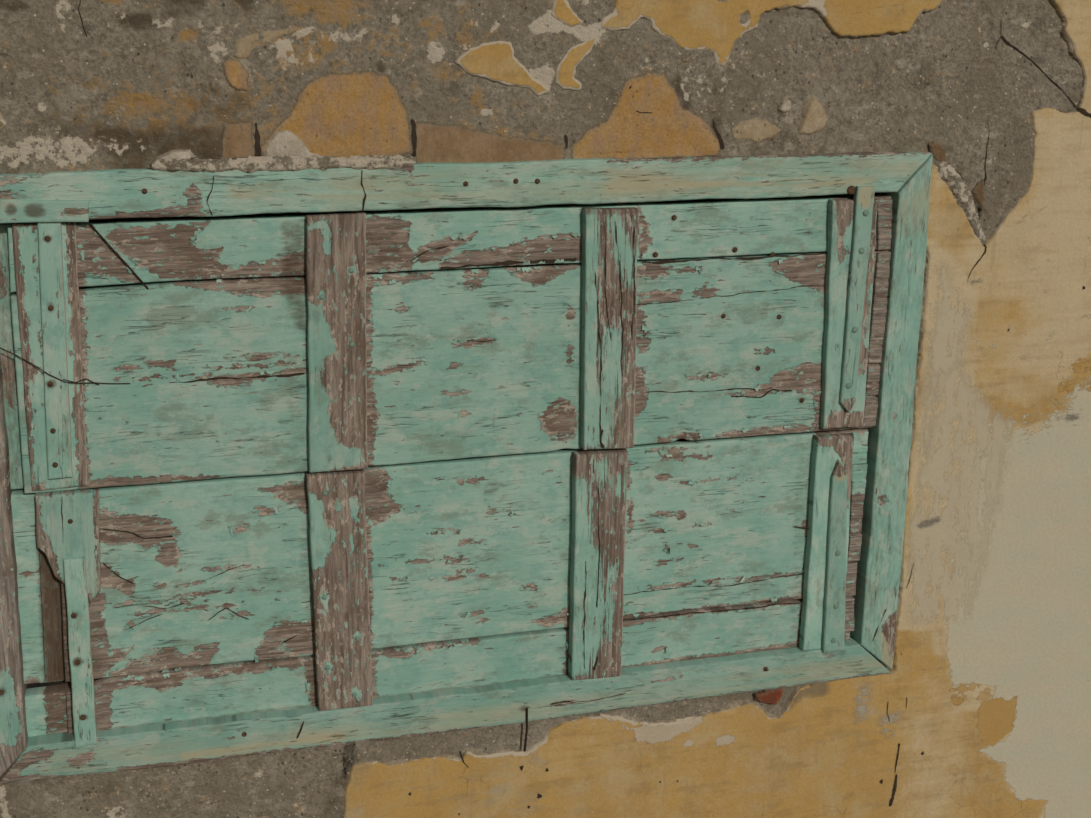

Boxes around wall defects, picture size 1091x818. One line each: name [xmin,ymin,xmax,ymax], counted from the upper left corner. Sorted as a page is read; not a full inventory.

flaking render [0,0,1083,245]
crack [994,20,1091,117]
peeling [517,259,564,272]
peeling [942,358,1091,818]
flaking render [0,686,795,818]